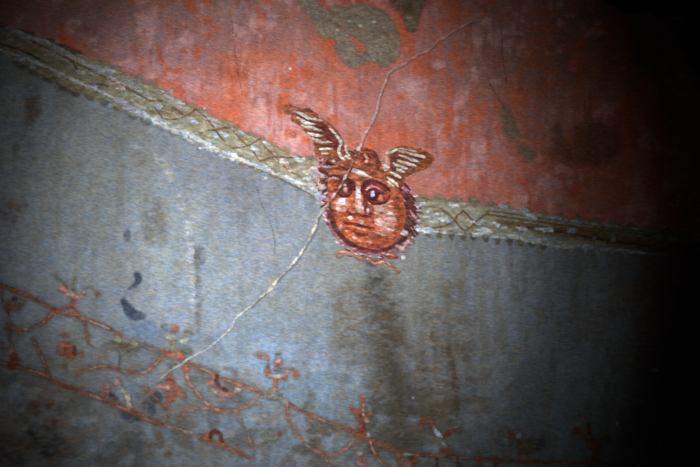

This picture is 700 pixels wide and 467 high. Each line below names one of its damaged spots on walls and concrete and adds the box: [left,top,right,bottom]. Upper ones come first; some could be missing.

crack [161,21,473,378]
peeling [298,0,425,69]